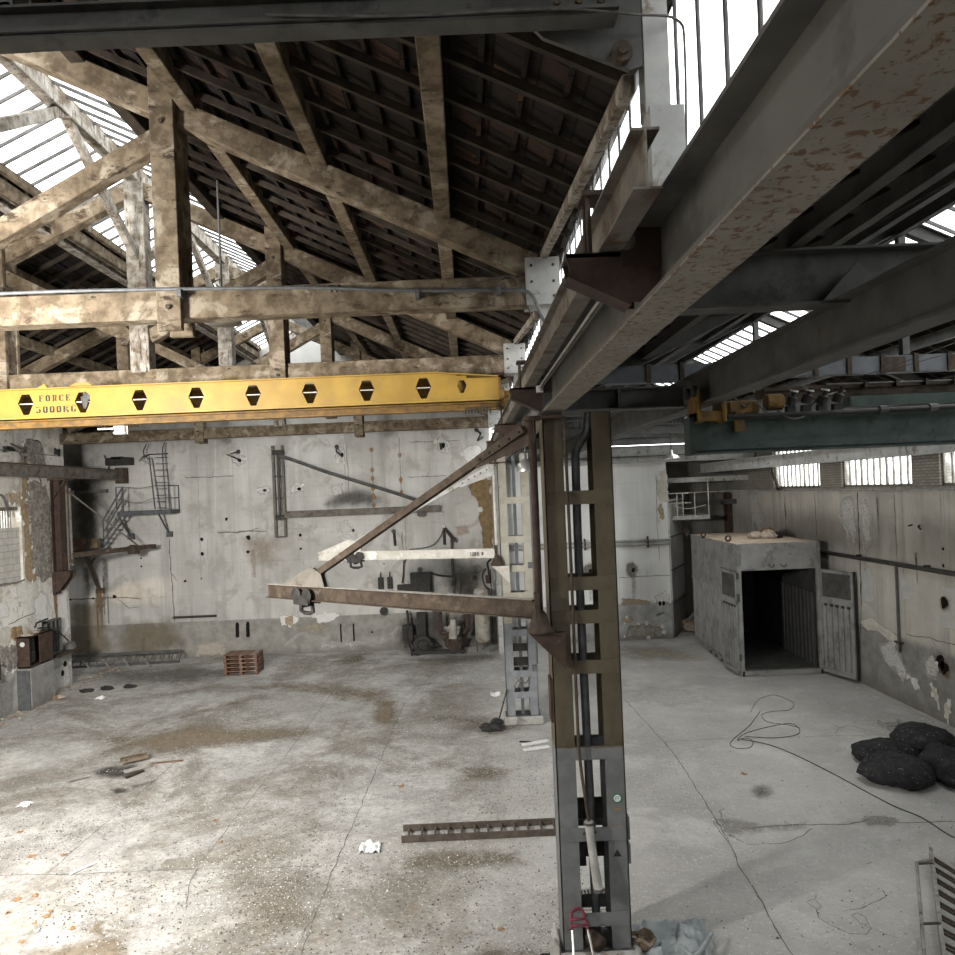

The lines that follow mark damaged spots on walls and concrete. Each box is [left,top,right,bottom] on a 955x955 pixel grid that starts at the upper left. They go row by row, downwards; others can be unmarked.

flaking render [19,438,46,465]
flaking render [6,477,53,583]
flaking render [468,479,493,548]
flaking render [619,590,672,640]
hole [936,655,949,677]
crack [679,805,955,845]
crack [808,891,894,937]